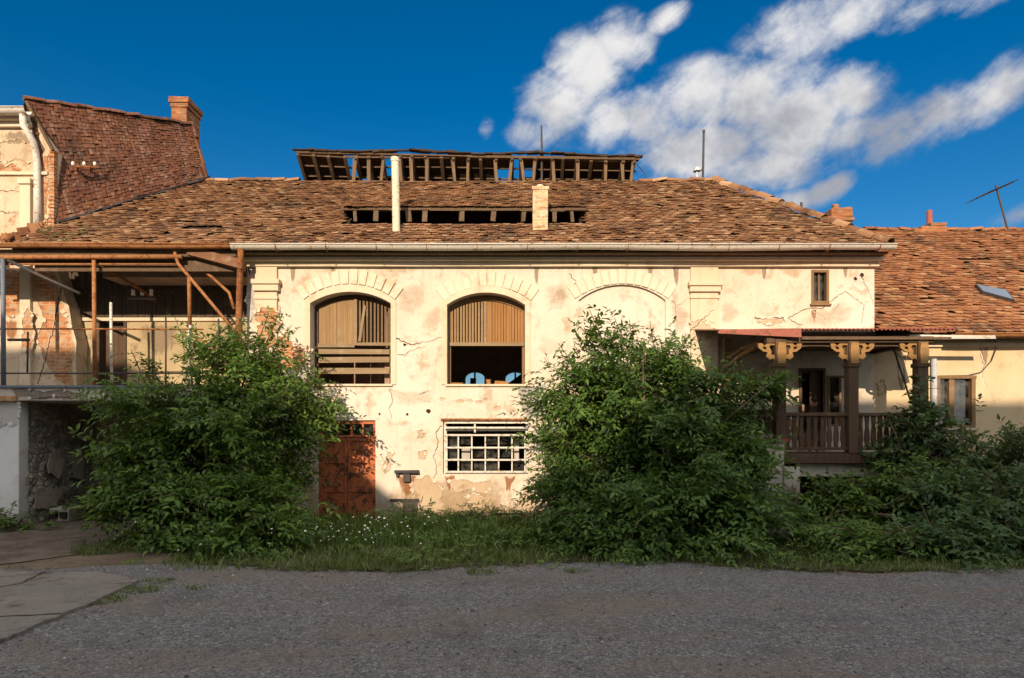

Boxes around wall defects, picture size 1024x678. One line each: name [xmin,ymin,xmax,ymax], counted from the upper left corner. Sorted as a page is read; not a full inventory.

peeling [0,138,49,243]
crack [754,277,874,326]
peeling [0,268,75,428]
crack [396,337,442,357]
crack [432,425,442,479]
peeling [409,473,493,517]